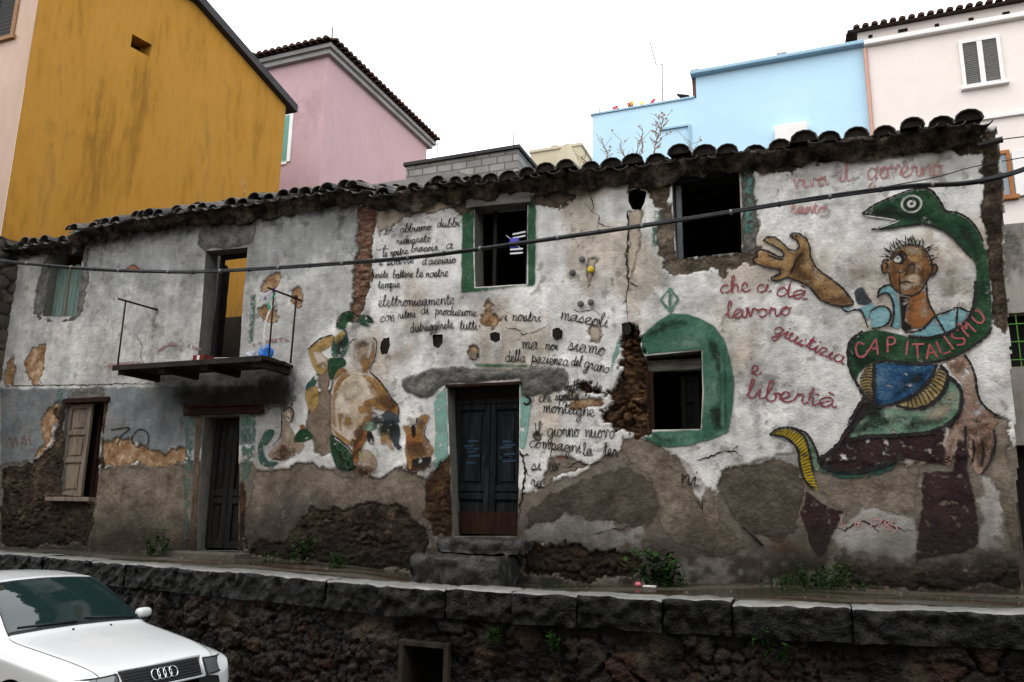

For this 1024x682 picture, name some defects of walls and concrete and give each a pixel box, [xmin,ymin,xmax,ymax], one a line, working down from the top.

peeling [259,306,280,325]
peeling [261,273,281,292]
peeling [291,287,303,308]
flaking render [350,202,454,322]
crack [584,195,638,319]
peeling [4,344,46,386]
spalling [562,331,652,439]
peeling [37,403,66,456]
peeling [101,438,186,469]